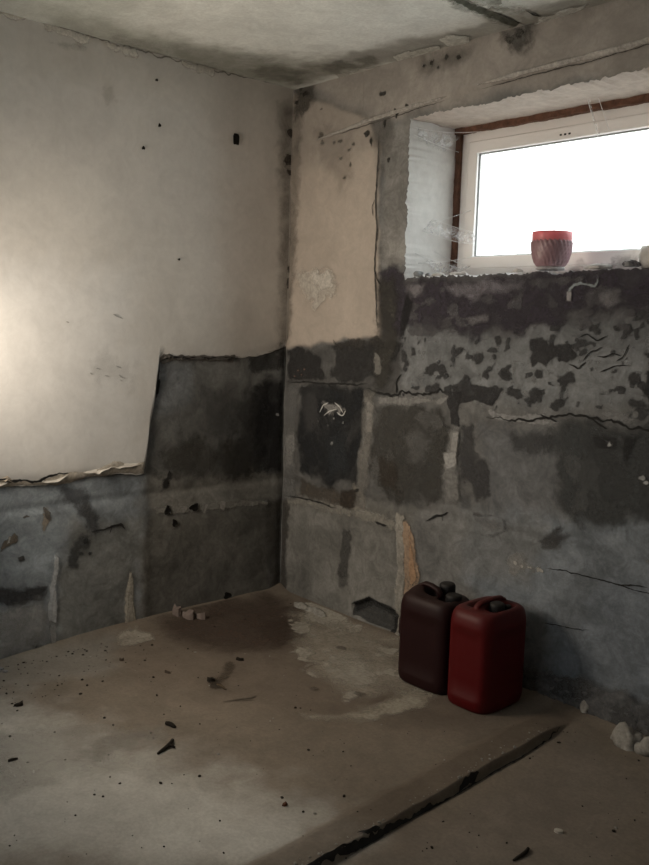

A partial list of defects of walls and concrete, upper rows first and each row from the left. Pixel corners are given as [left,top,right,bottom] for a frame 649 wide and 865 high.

peeling [156,354,238,398]
spalling [401,310,649,427]
crack [486,409,649,432]
peeling [0,461,145,488]
spalling [352,597,399,633]
crack [307,727,560,865]